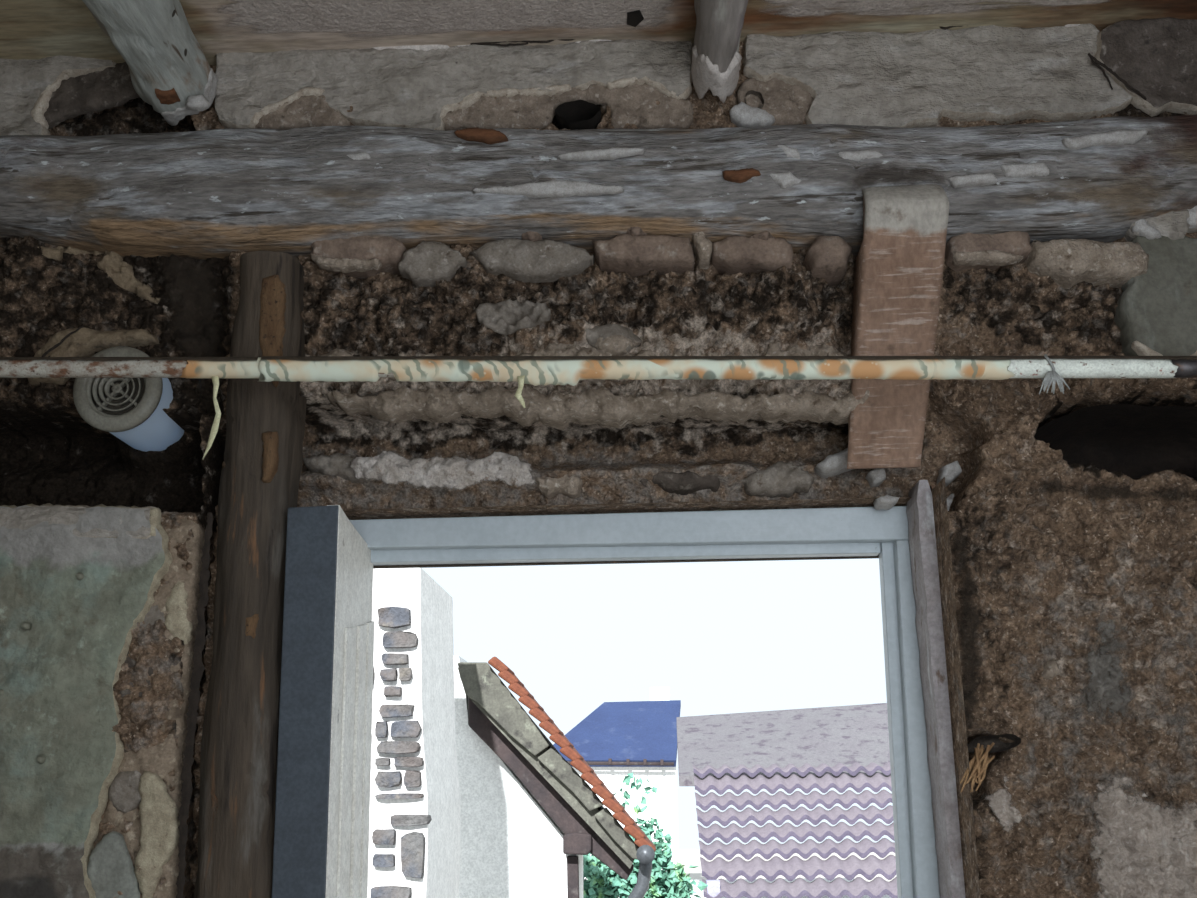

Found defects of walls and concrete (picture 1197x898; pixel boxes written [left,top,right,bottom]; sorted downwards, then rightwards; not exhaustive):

spalling [7,62,140,135]
spalling [214,87,418,130]
spalling [433,43,694,131]
spalling [1034,404,1197,481]
spalling [80,516,205,898]